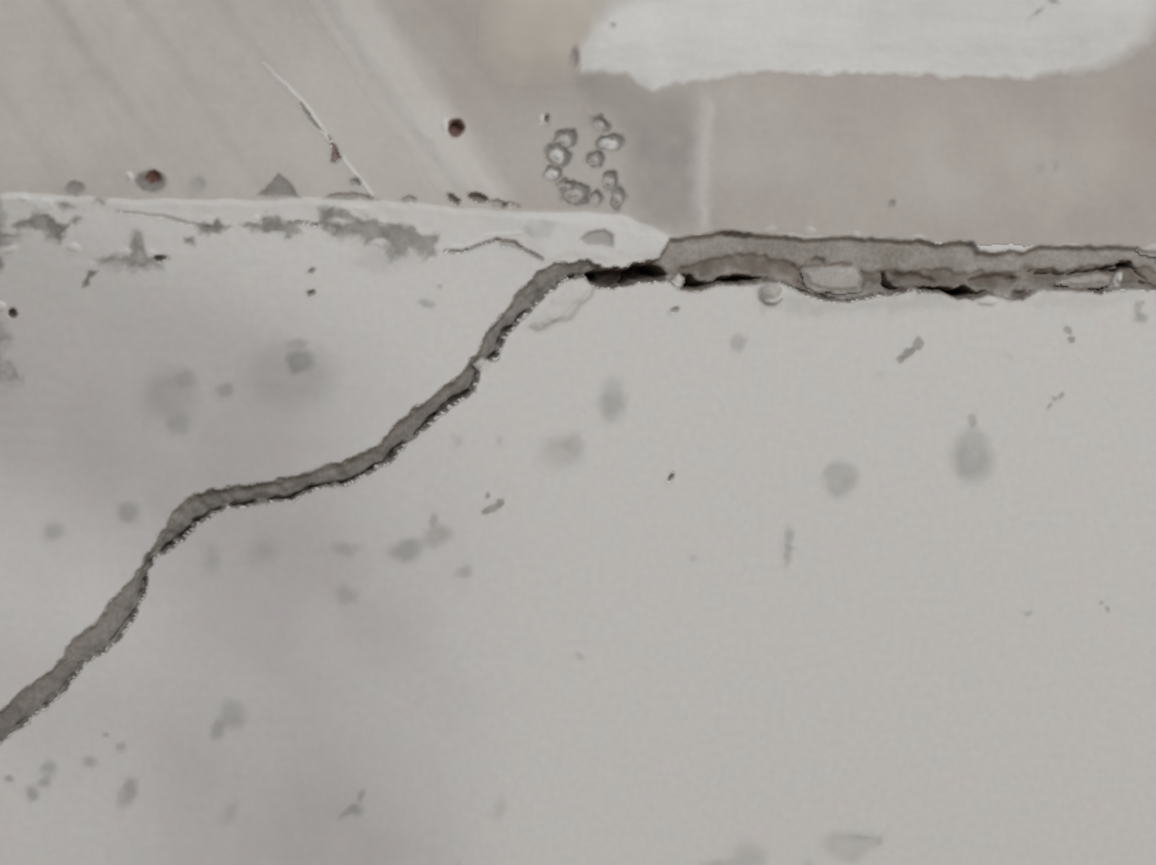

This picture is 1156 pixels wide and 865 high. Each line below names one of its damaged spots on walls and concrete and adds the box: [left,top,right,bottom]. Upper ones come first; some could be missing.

peeling [0,188,168,290]
crack [113,207,198,228]
peeling [181,131,444,278]
peeling [0,310,28,396]
crack [0,229,1156,747]